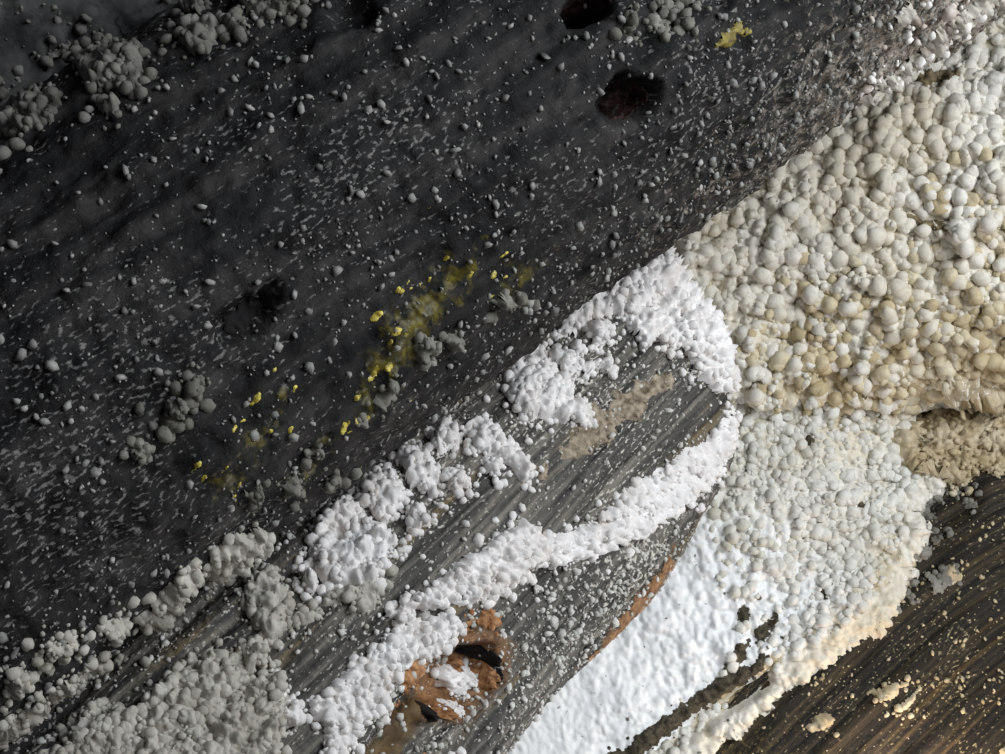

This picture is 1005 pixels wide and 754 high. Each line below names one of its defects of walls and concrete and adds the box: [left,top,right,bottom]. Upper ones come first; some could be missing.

damp [714,21,752,48]
damp [855,0,1005,109]
damp [0,246,743,754]
damp [891,345,1005,614]
corrosion [589,545,675,661]
corrosion [391,608,510,722]
damp [801,713,840,738]
damp [867,670,922,726]